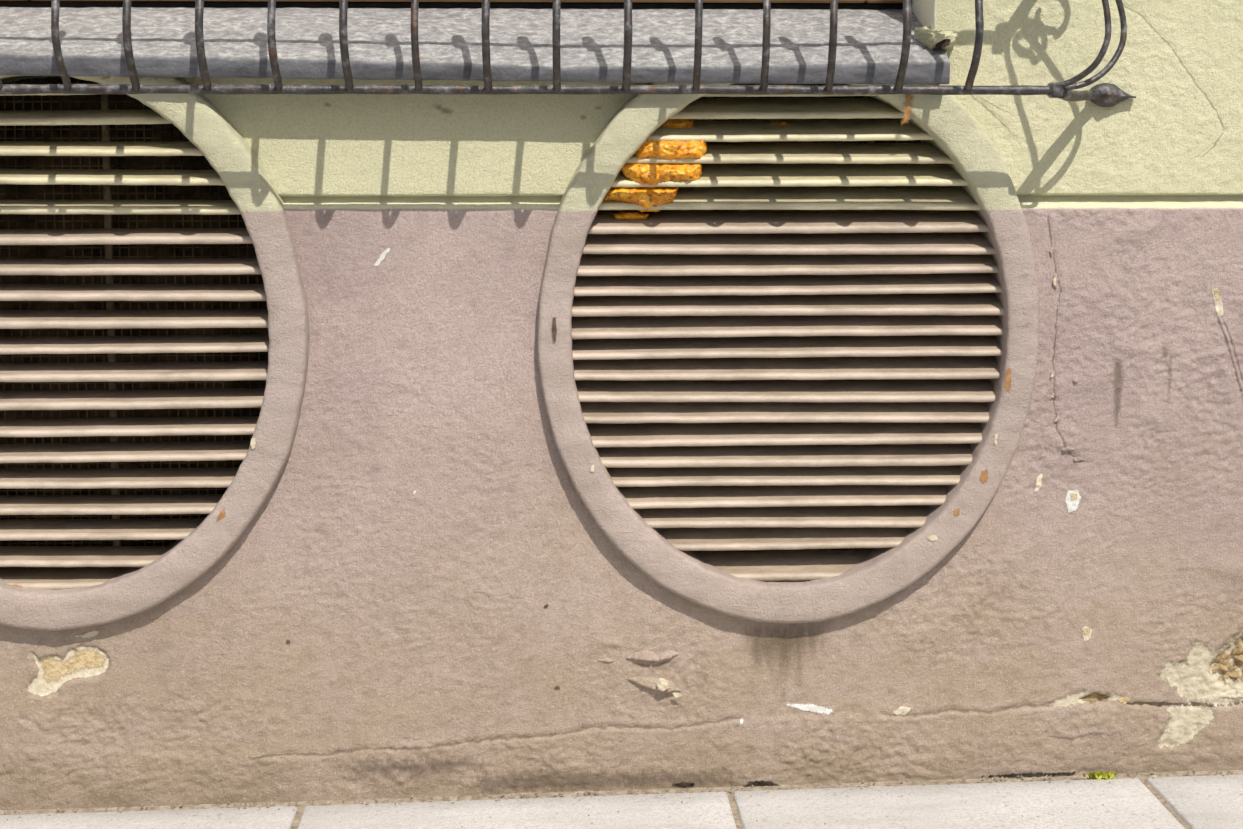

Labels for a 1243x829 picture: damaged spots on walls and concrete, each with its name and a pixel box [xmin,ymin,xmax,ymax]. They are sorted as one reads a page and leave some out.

peeling [28,630,109,697]
flaking render [1156,629,1243,749]